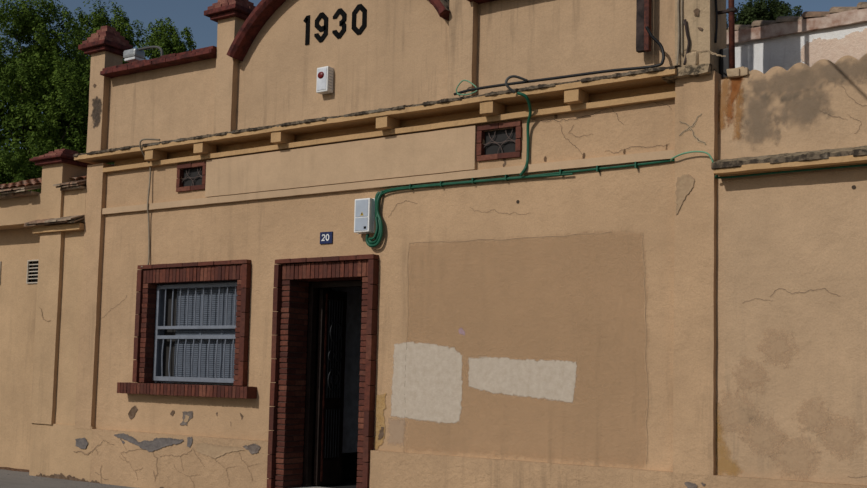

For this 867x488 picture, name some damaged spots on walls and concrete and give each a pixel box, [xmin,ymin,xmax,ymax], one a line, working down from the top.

peeling [801,28,867,67]
rust [718,76,743,139]
crack [531,102,706,155]
crack [743,287,840,303]
spalling [170,410,193,426]
spalling [75,437,88,449]
spalling [114,433,193,452]
spalling [243,444,260,454]